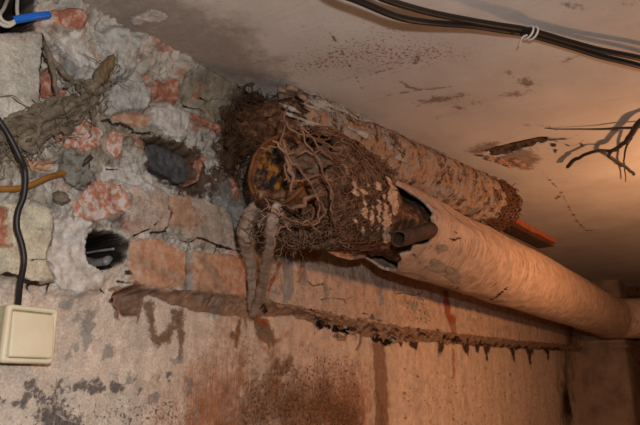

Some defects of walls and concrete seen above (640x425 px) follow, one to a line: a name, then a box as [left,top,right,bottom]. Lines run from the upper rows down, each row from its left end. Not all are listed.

spalling [51,8,88,29]
peeling [130,9,168,26]
spalling [142,72,180,106]
spalling [471,137,566,170]
spalling [56,118,245,243]
spalling [85,235,115,270]
crack [133,222,237,254]
spalling [108,238,247,319]
corrosion [443,289,456,332]
leakage [0,377,214,425]
leakage [231,333,363,425]
leakage [373,342,389,425]